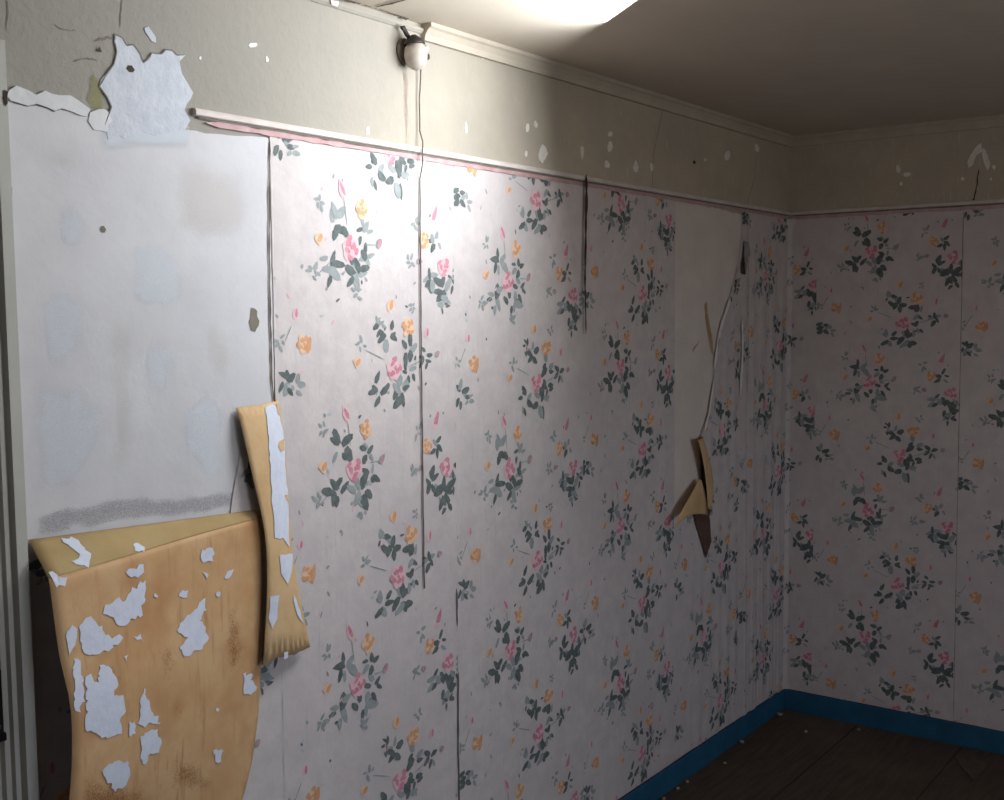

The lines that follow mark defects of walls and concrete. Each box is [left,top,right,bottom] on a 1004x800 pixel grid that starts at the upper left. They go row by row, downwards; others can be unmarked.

crack [56,0,123,62]
crack [331,0,409,20]
flaking render [3,26,310,666]
peeling [674,438,713,557]